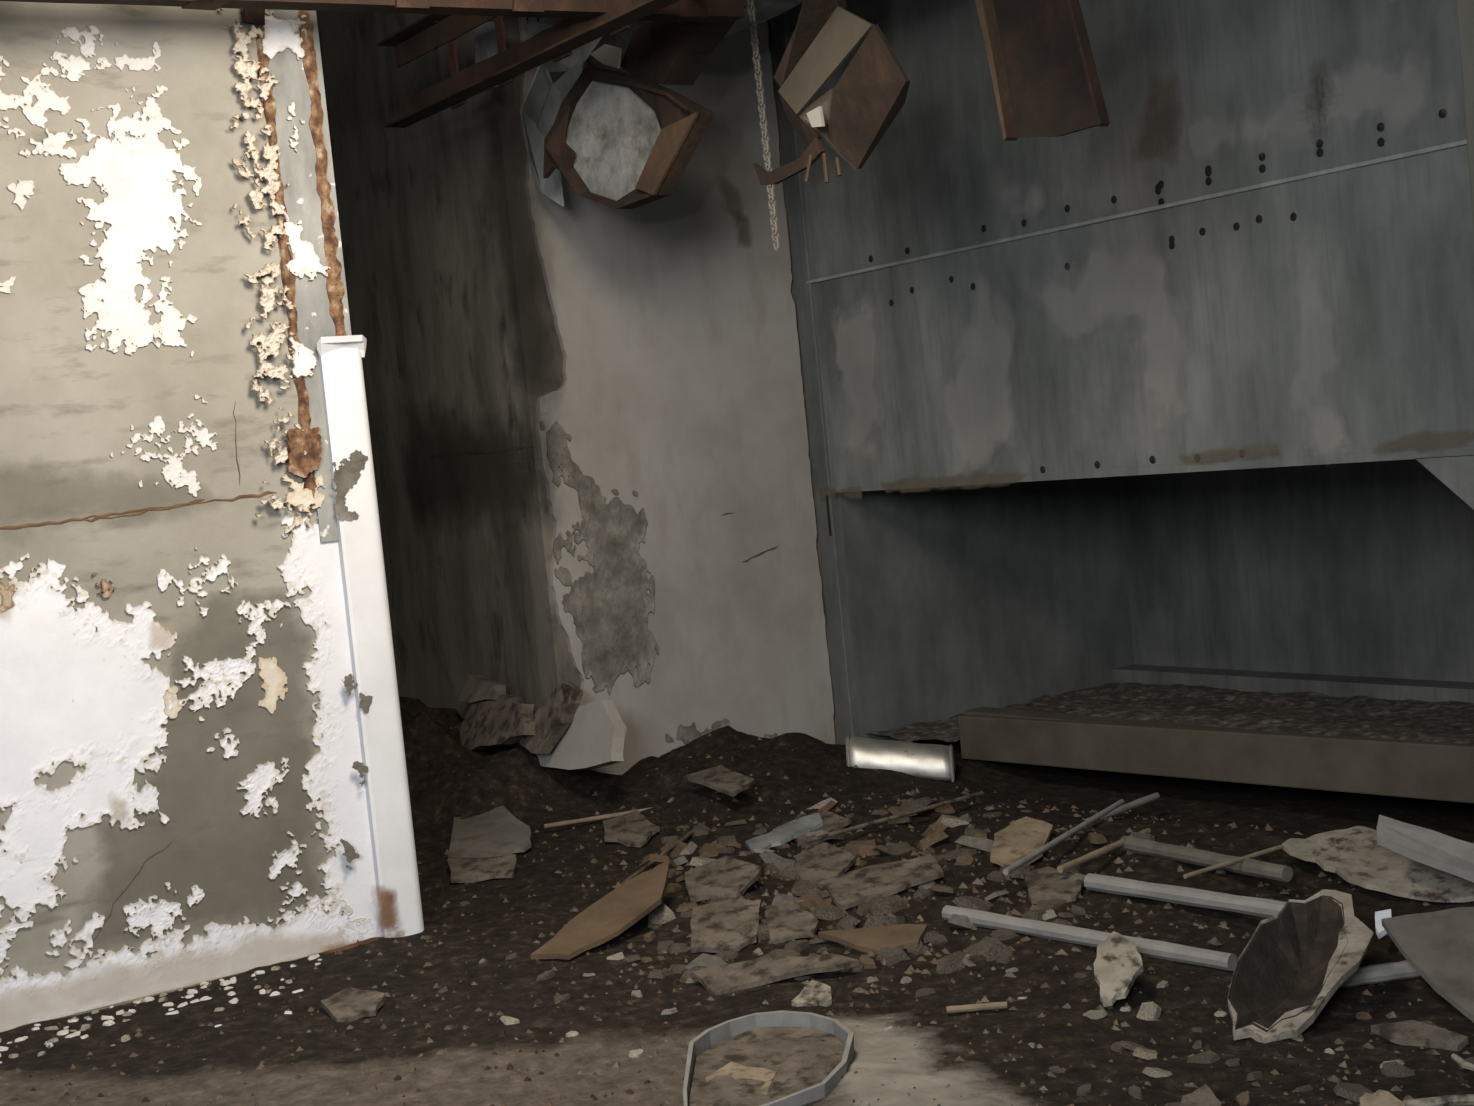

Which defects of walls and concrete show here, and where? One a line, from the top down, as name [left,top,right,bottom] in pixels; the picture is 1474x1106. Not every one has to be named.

corrosion [255,25,311,429]
corrosion [298,10,346,336]
crack [0,401,276,530]
peeling [0,8,382,1032]
corrosion [302,470,318,497]
flaking render [539,421,659,695]